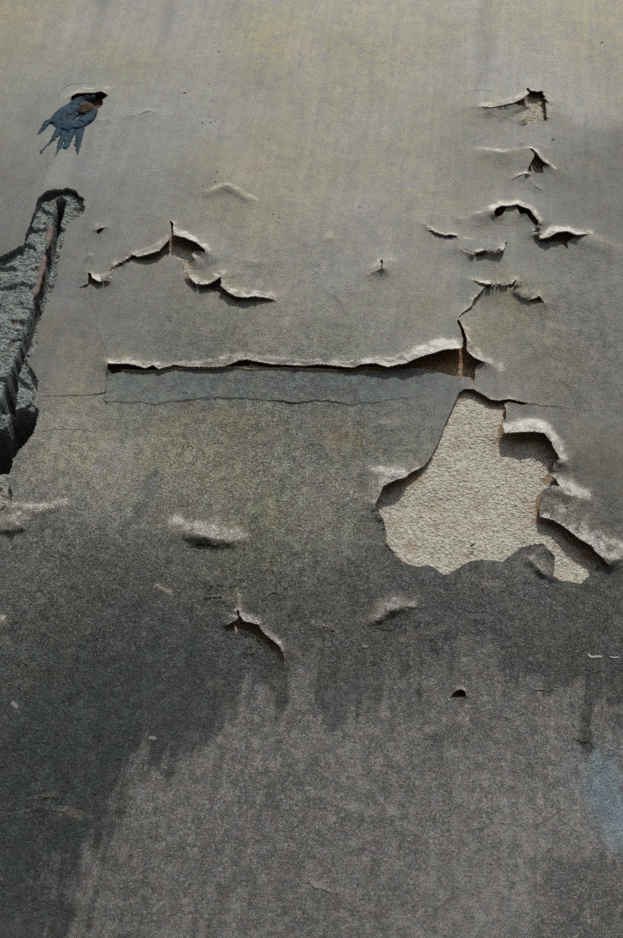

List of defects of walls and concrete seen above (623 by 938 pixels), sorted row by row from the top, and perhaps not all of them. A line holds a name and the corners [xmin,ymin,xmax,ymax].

peeling [59,81,119,105]
spalling [0,188,85,259]
flaking render [69,210,290,314]
flaking render [414,76,600,318]
crack [86,281,505,381]
flaking render [343,374,617,584]
flaking render [0,604,15,627]